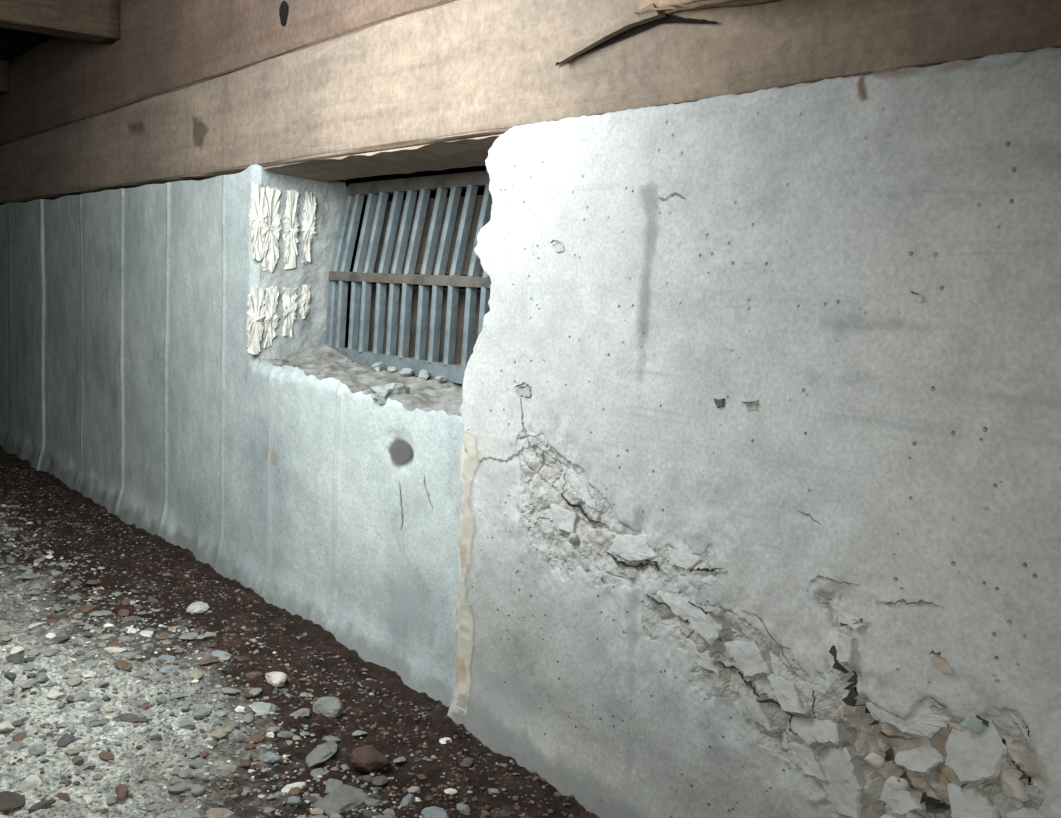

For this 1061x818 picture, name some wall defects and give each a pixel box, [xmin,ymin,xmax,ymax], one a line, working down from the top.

crack [479,392,565,492]
crack [739,609,795,673]
spalling [517,426,1048,818]
crack [808,575,858,585]